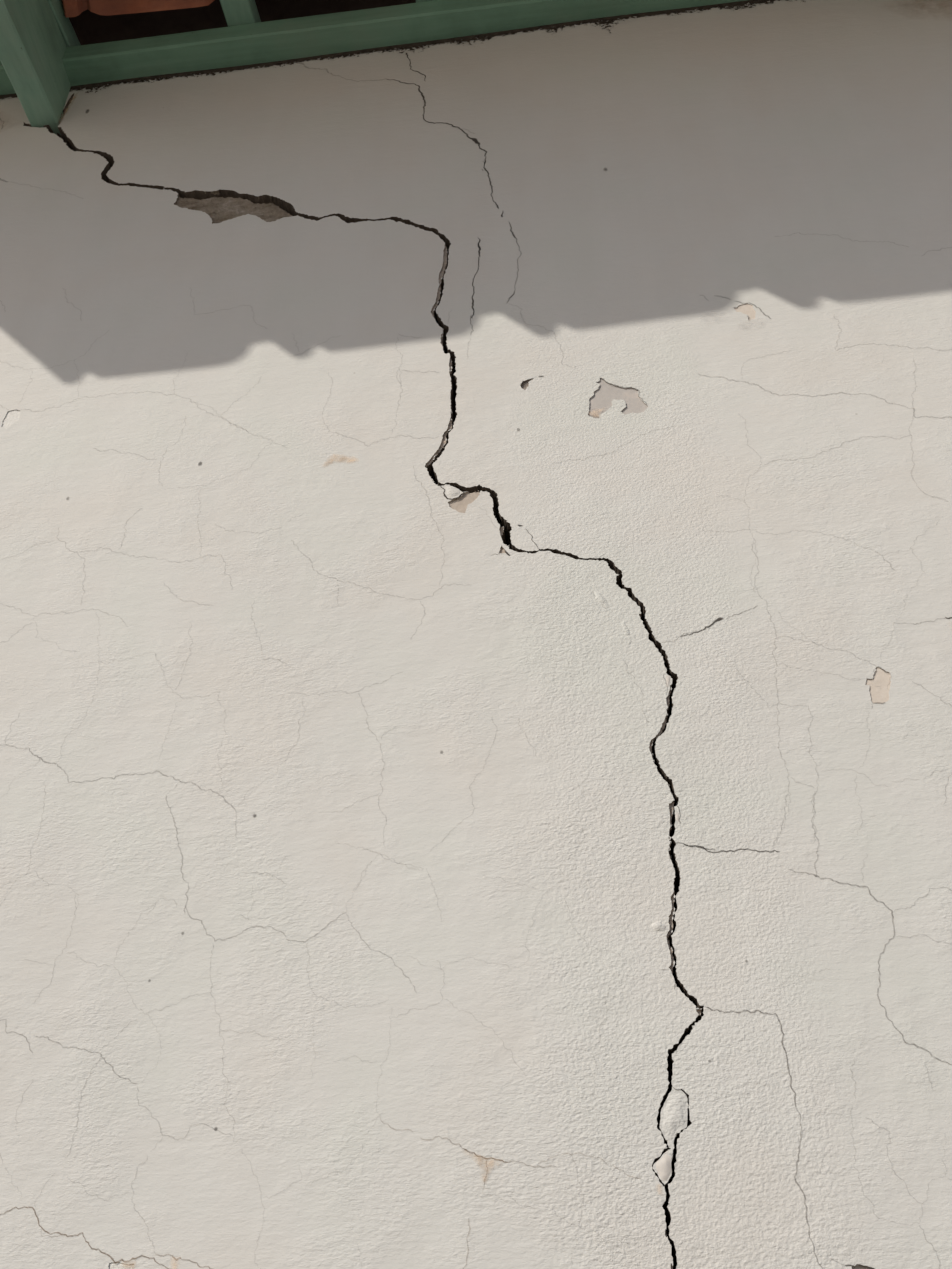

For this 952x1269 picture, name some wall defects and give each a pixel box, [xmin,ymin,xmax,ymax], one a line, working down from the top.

spalling [174,190,292,224]
crack [387,53,521,303]
peeling [588,378,648,418]
crack [7,93,796,1269]